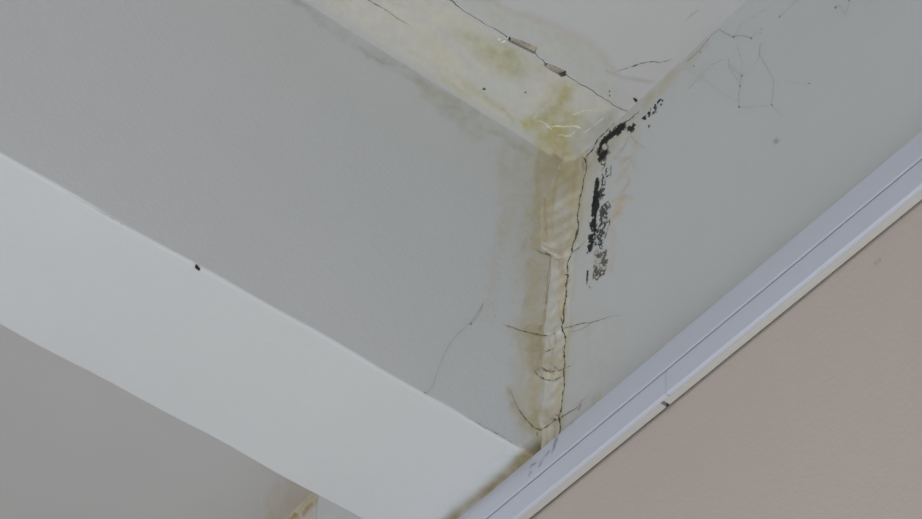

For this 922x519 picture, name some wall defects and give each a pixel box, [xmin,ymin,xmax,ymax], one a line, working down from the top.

leakage [302,0,718,449]
crack [558,128,645,434]
leakage [259,476,318,519]